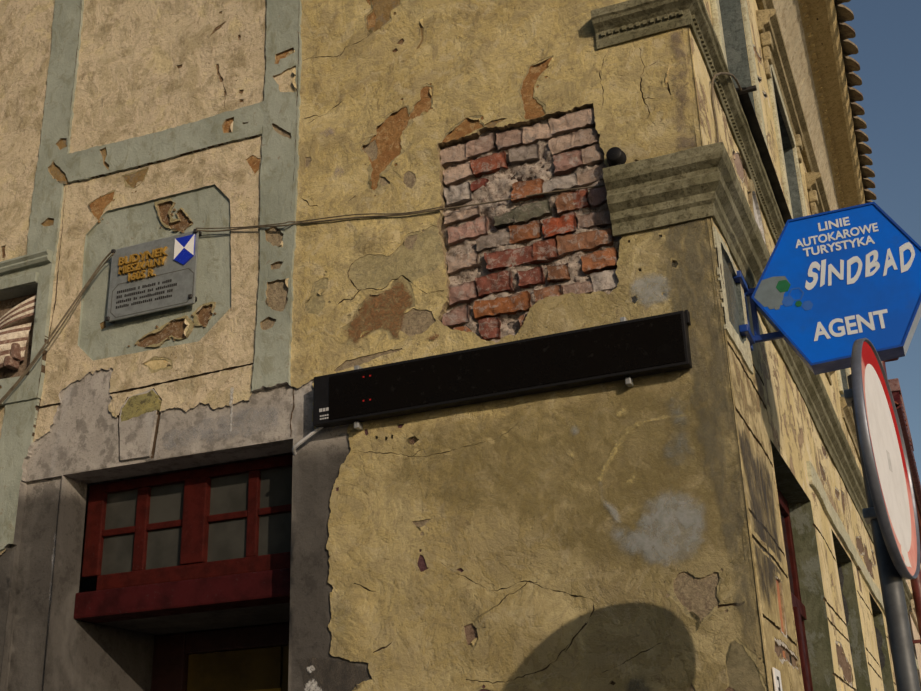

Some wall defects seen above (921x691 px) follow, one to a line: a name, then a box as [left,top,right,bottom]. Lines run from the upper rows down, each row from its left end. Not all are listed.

peeling [364,0,401,34]
peeling [154,198,193,233]
flaking render [334,56,622,372]
peeling [128,302,216,373]
crack [442,563,595,684]
spalling [663,568,745,632]
spalling [725,575,800,691]
peeling [835,564,853,688]
peeling [856,536,877,595]